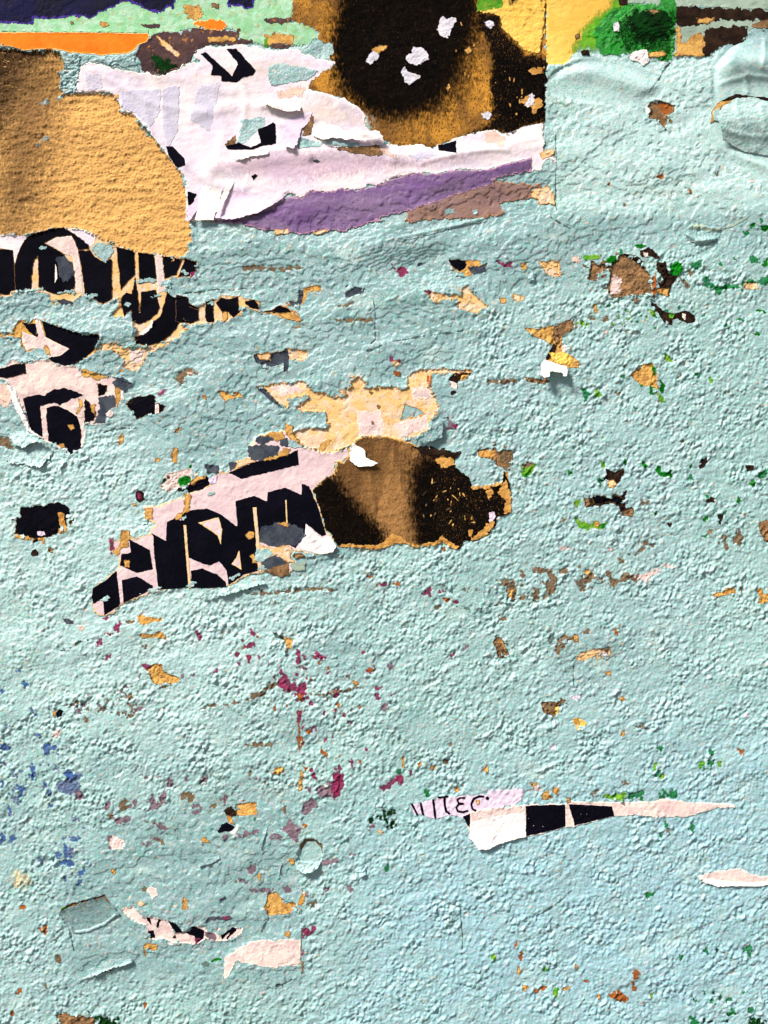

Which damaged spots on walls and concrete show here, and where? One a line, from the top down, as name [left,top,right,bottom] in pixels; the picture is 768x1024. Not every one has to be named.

spalling [0,0,319,262]
spalling [424,243,768,326]
peeling [101,339,170,372]
peeling [126,389,166,420]
peeling [172,368,198,387]
peeling [218,389,242,401]
spalling [254,346,472,455]
peeling [0,430,71,472]
peeling [159,465,198,494]
spalling [477,442,536,481]
peeling [562,459,650,531]
peeling [201,575,265,599]